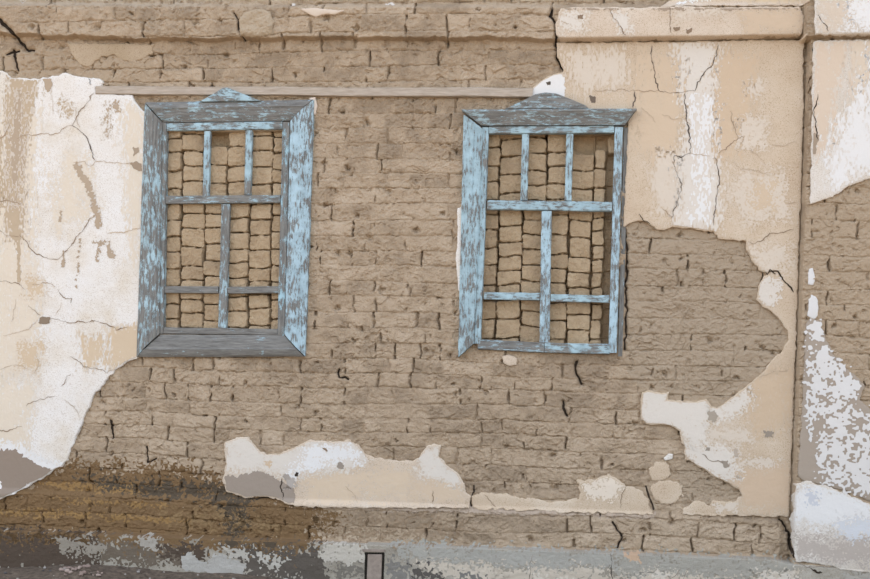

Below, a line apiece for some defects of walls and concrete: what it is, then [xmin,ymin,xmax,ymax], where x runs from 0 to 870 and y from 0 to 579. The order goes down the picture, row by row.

peeling [533,8,639,103]
crack [0,79,129,166]
spalling [130,147,142,171]
crack [594,48,795,226]
crack [0,281,127,336]
crack [622,242,630,350]
spalling [626,0,870,536]
crack [763,269,794,292]
spalling [0,438,63,497]
water stain [0,454,870,579]
spalling [224,438,656,520]
water stain [719,357,794,515]